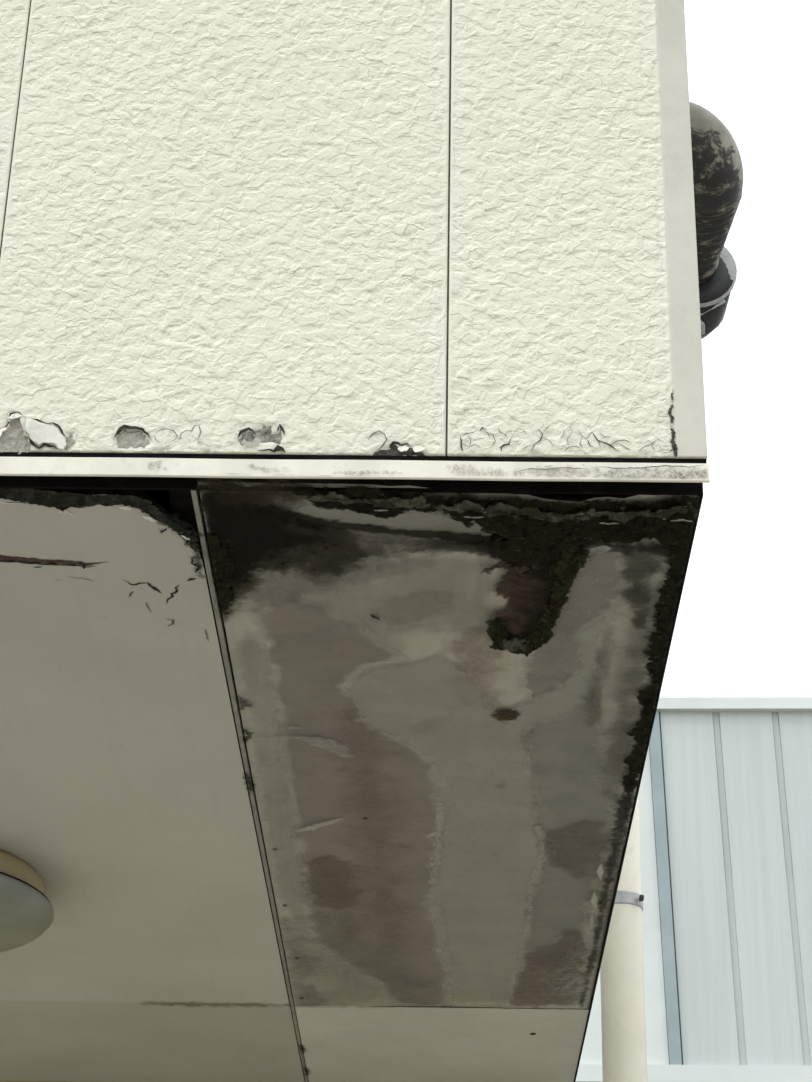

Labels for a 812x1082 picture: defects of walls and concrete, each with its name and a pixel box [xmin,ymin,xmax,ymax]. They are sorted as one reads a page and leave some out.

spalling [0,411,75,454]
spalling [114,425,152,449]
spalling [238,424,285,452]
spalling [368,430,426,456]
crack [460,391,678,457]
leakage [155,478,506,621]
crack [0,555,200,627]
leakage [253,513,695,1008]